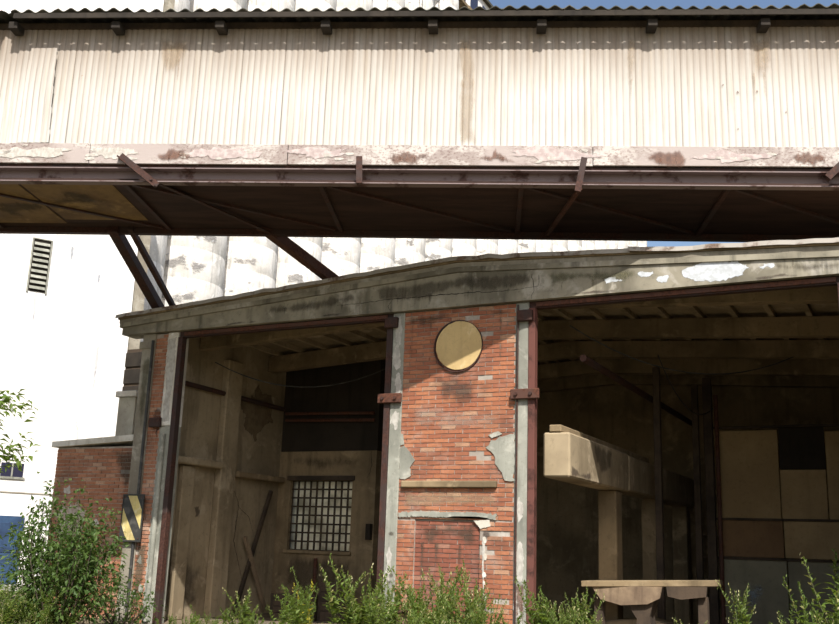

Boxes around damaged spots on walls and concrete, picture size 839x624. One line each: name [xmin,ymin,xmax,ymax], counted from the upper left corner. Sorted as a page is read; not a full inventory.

peeling [0,144,71,158]
peeling [85,147,138,160]
corrosion [160,150,189,159]
peeling [179,147,262,160]
peeling [286,147,354,161]
corrosion [392,152,426,164]
corrosion [650,152,685,166]
peeling [638,271,669,282]
peeling [682,261,749,282]